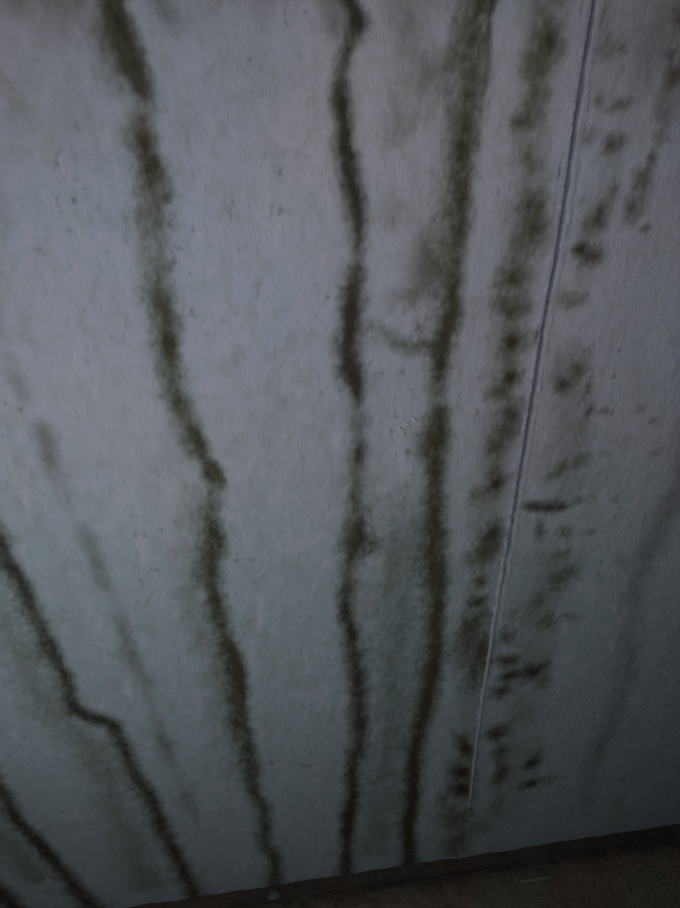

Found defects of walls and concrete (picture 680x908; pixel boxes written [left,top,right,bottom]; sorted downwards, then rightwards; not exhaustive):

leakage [0,533,202,908]
leakage [102,0,152,102]
leakage [135,115,164,211]
leakage [152,281,281,887]
leakage [332,0,367,251]
leakage [338,263,362,403]
leakage [339,494,376,877]
leakage [400,405,449,866]
leakage [404,0,496,393]
leakage [494,656,545,697]
crack [468,0,601,810]
leakage [524,503,566,513]